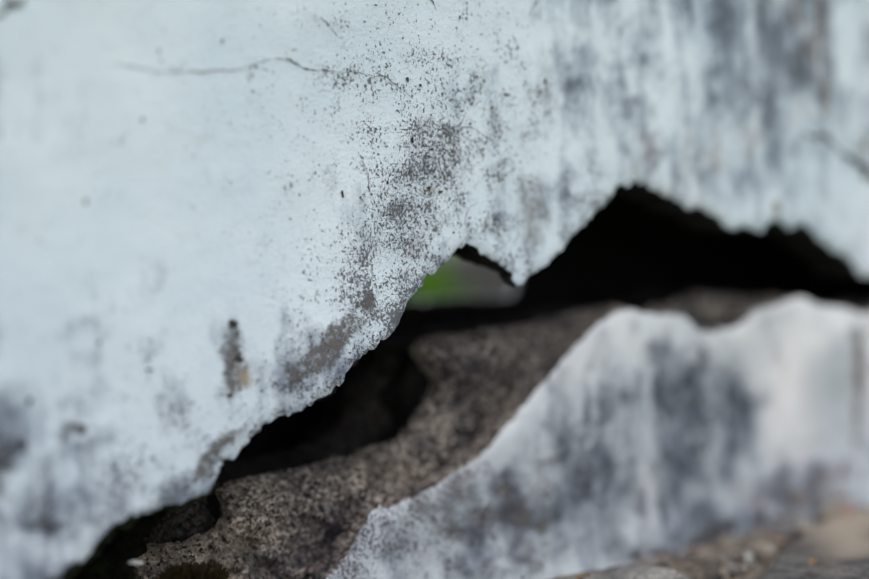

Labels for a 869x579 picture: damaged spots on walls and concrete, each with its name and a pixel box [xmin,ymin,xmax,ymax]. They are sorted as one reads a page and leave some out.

crack [117,58,413,99]
crack [795,131,869,180]
leakage [219,320,244,398]
leakage [285,293,375,382]
spalling [807,297,869,310]
spalling [134,287,766,579]